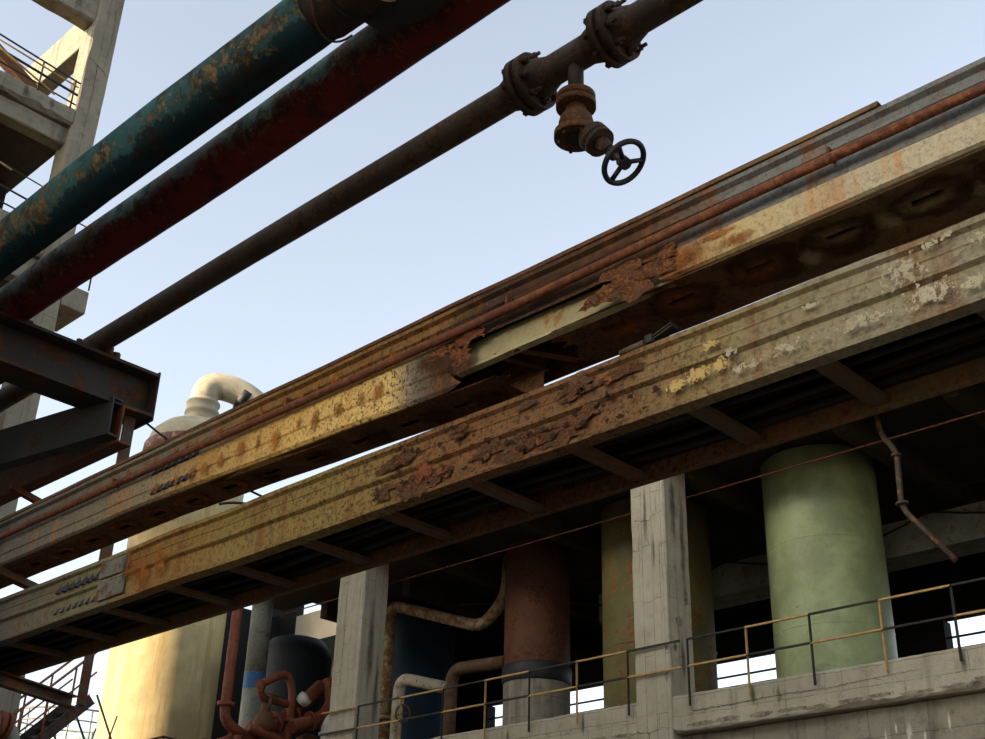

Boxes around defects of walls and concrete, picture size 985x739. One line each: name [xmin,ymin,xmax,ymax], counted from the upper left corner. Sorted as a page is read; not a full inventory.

corrosion [650,164,985,319]
peeling [877,187,954,228]
peeling [665,225,985,392]
corrosion [475,391,510,406]
corrosion [363,431,392,444]
corrosion [396,410,491,484]